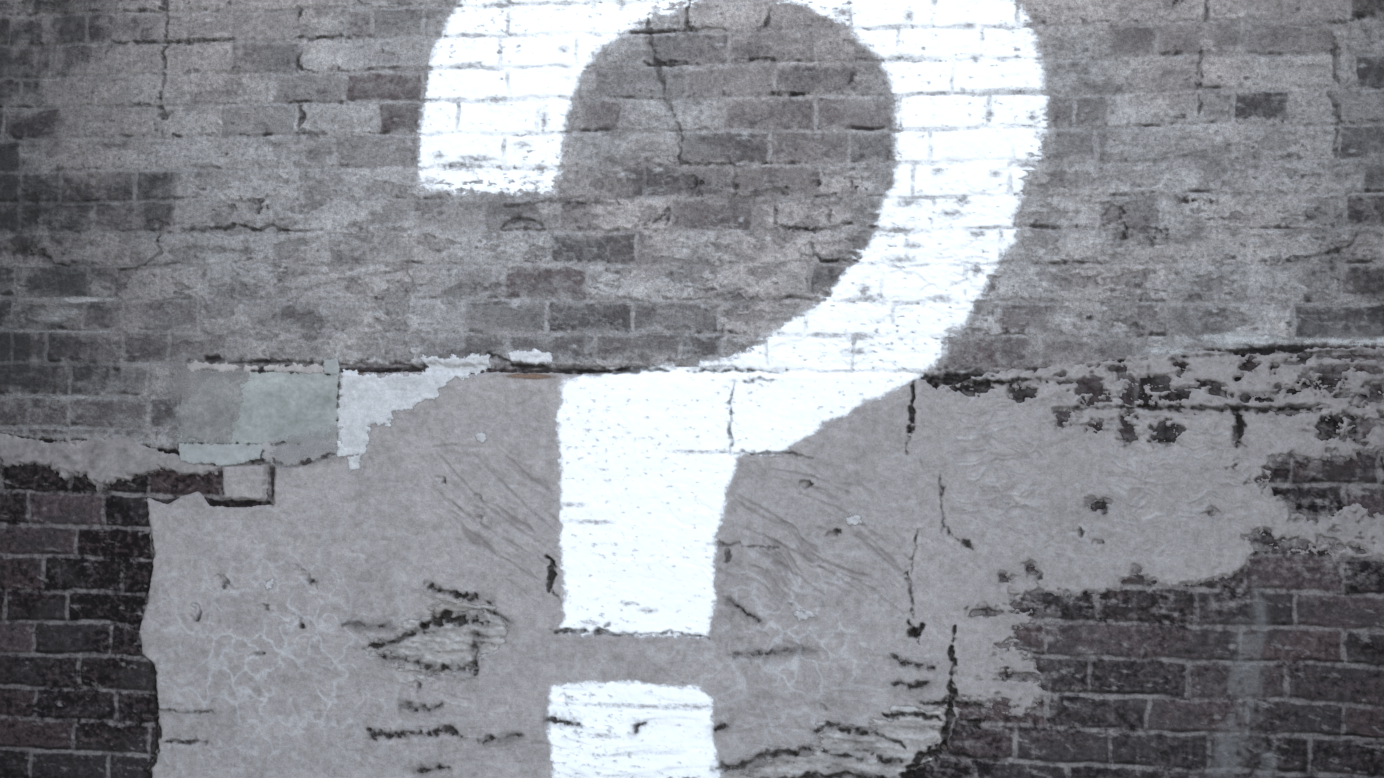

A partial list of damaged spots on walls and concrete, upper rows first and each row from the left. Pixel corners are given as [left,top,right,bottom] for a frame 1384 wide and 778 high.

crack [119,0,224,120]
crack [648,8,697,84]
crack [907,375,1041,437]
crack [1073,404,1312,448]
crack [882,478,999,778]